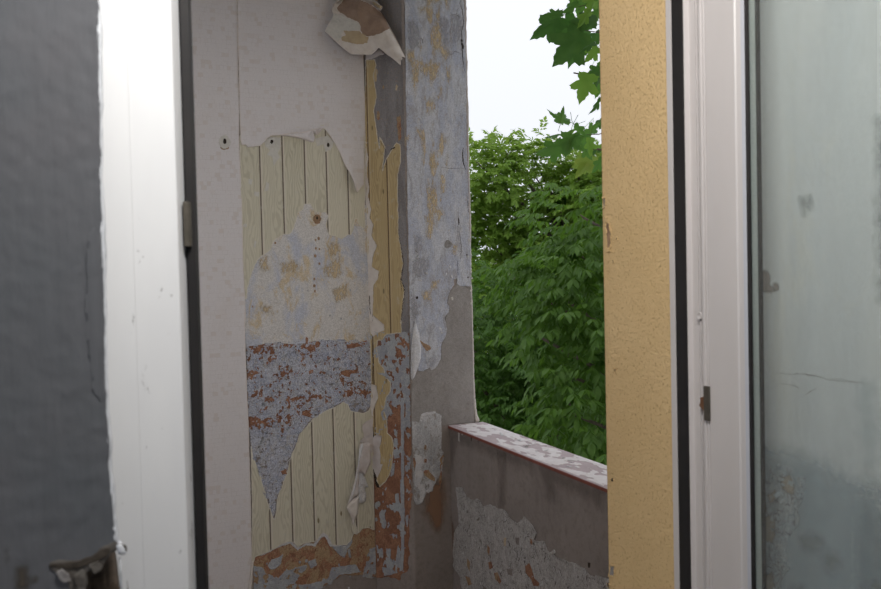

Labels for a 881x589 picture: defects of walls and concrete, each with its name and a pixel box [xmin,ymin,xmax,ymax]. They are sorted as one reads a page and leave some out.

hole [49,541,128,589]
peeling [246,0,615,589]